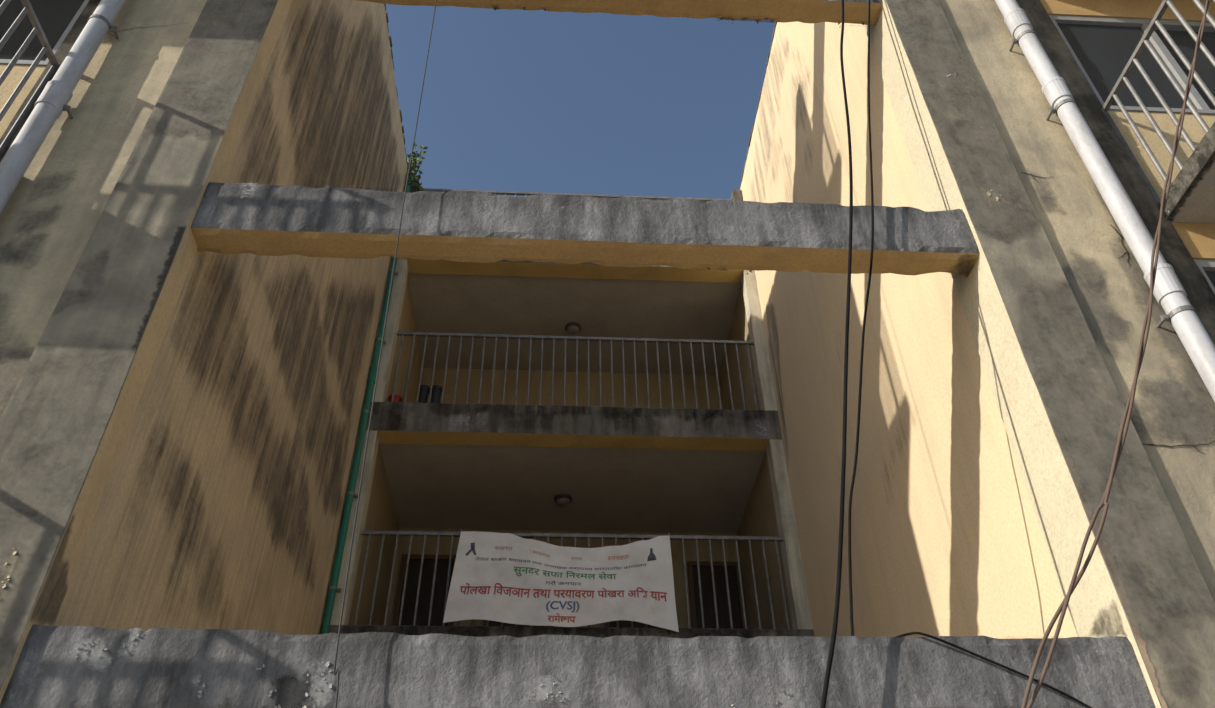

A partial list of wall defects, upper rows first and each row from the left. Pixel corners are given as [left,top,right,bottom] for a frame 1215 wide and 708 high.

leakage [140,0,277,137]
leakage [286,7,399,192]
leakage [886,0,1054,241]
leakage [0,226,186,701]
leakage [184,258,374,583]
leakage [1021,247,1215,708]
crack [1145,441,1214,454]
peeling [75,628,141,670]
spalling [268,661,334,708]